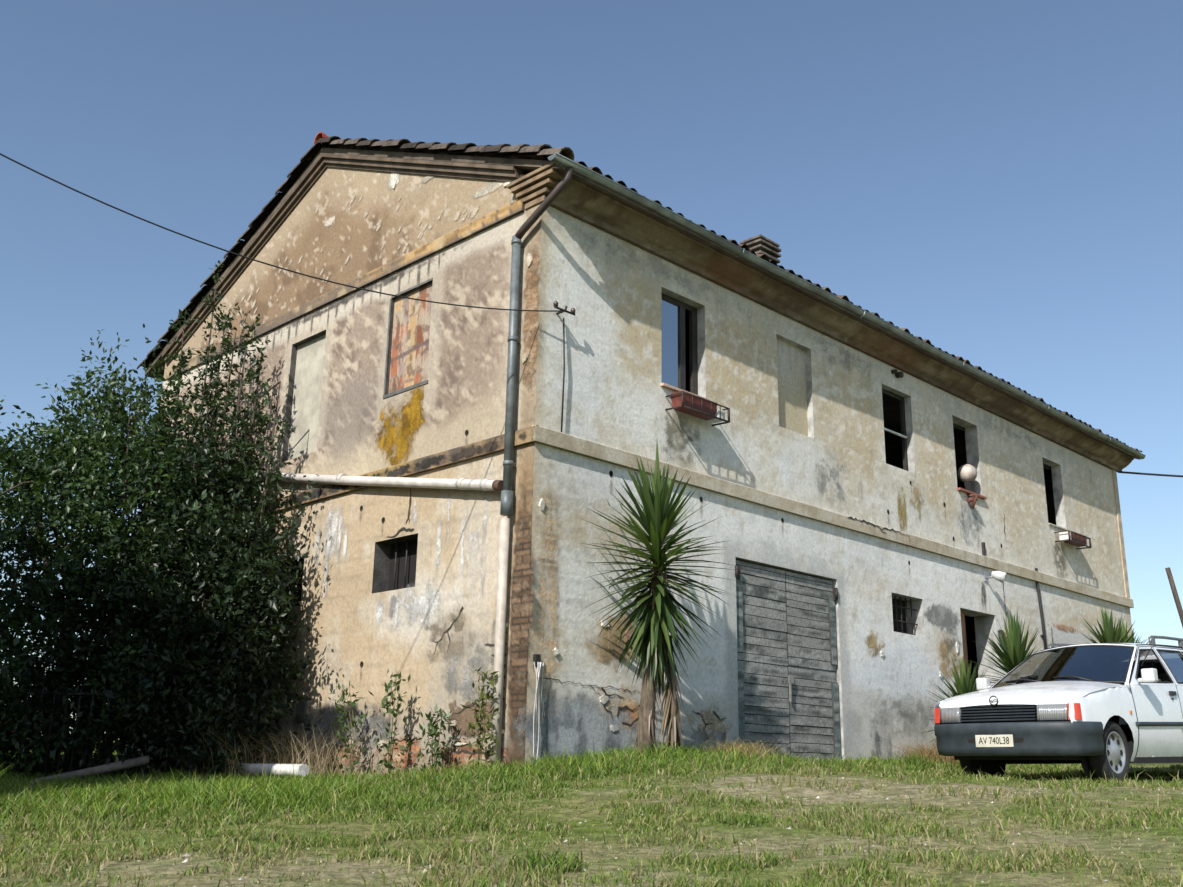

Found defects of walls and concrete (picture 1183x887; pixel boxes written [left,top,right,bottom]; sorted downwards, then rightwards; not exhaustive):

flaking render [316,195,381,231]
flaking render [388,172,401,211]
flaking render [398,181,514,253]
crack [428,606,465,658]
water stain [296,698,389,745]
spalling [688,708,729,739]